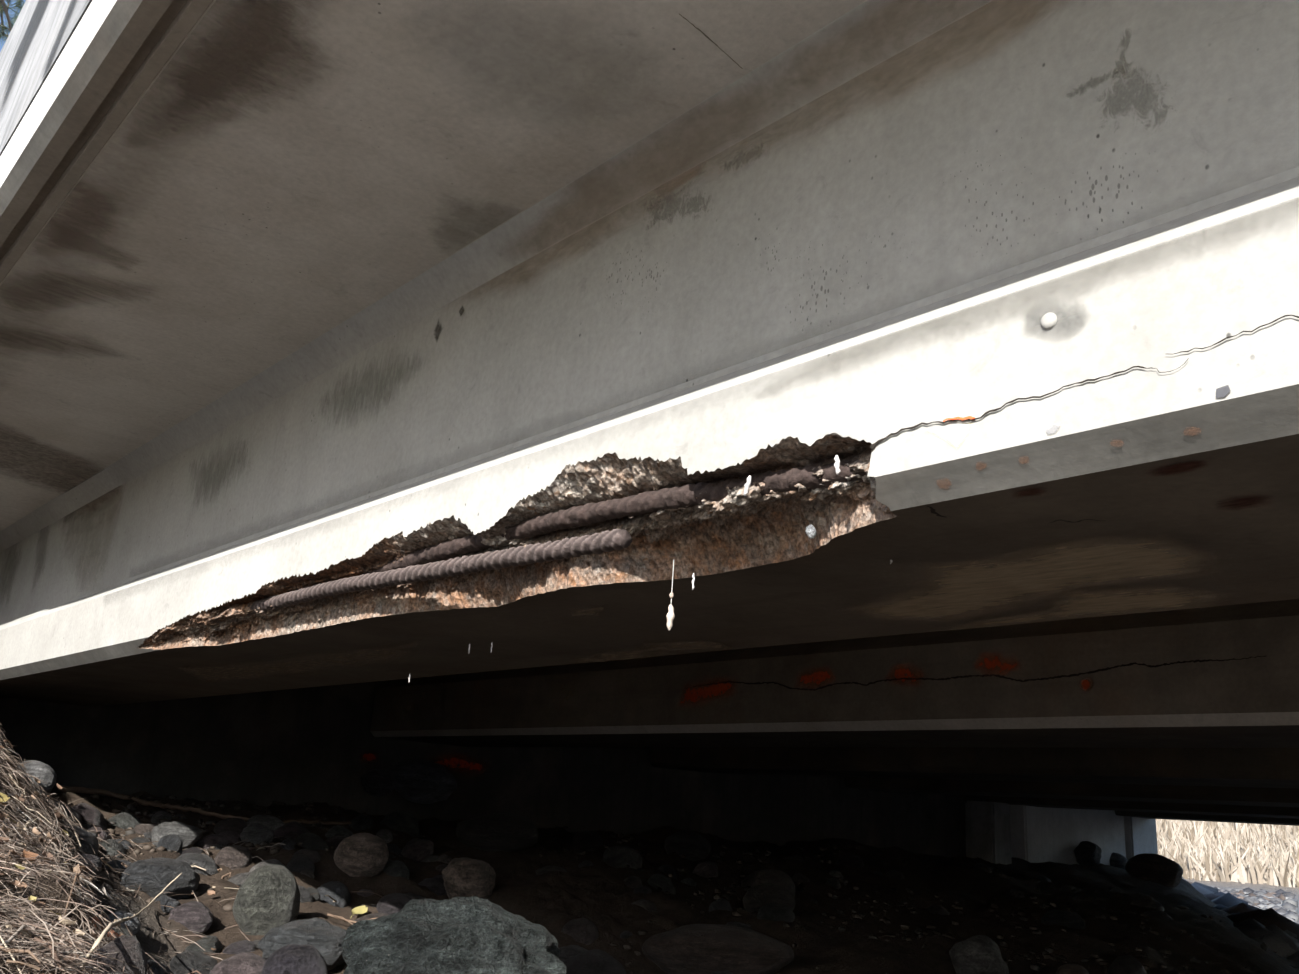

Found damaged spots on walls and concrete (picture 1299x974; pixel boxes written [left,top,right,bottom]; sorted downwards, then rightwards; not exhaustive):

water stain [1031,311,1082,331]
crack [870,315,1299,450]
spalling [137,433,898,650]
water stain [870,543,1202,625]
crack [693,656,1265,691]